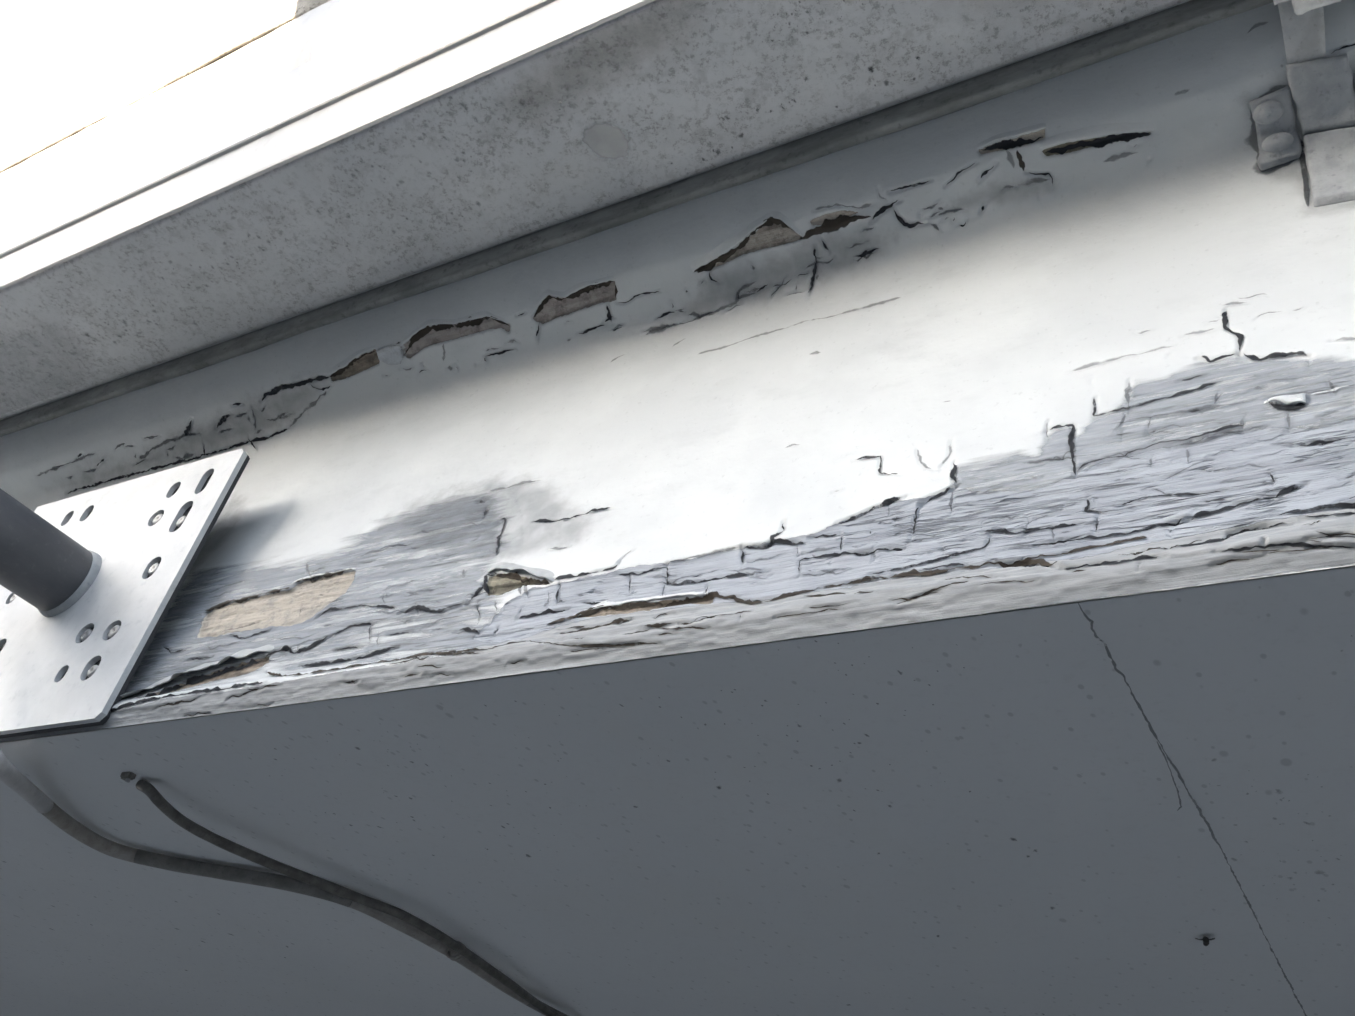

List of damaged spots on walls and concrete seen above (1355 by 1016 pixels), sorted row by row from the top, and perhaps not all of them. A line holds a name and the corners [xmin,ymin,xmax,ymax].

peeling [977,122,1155,170]
peeling [690,210,870,273]
peeling [529,276,618,324]
peeling [324,311,510,381]
peeling [0,360,1355,742]
crack [111,311,1355,1016]